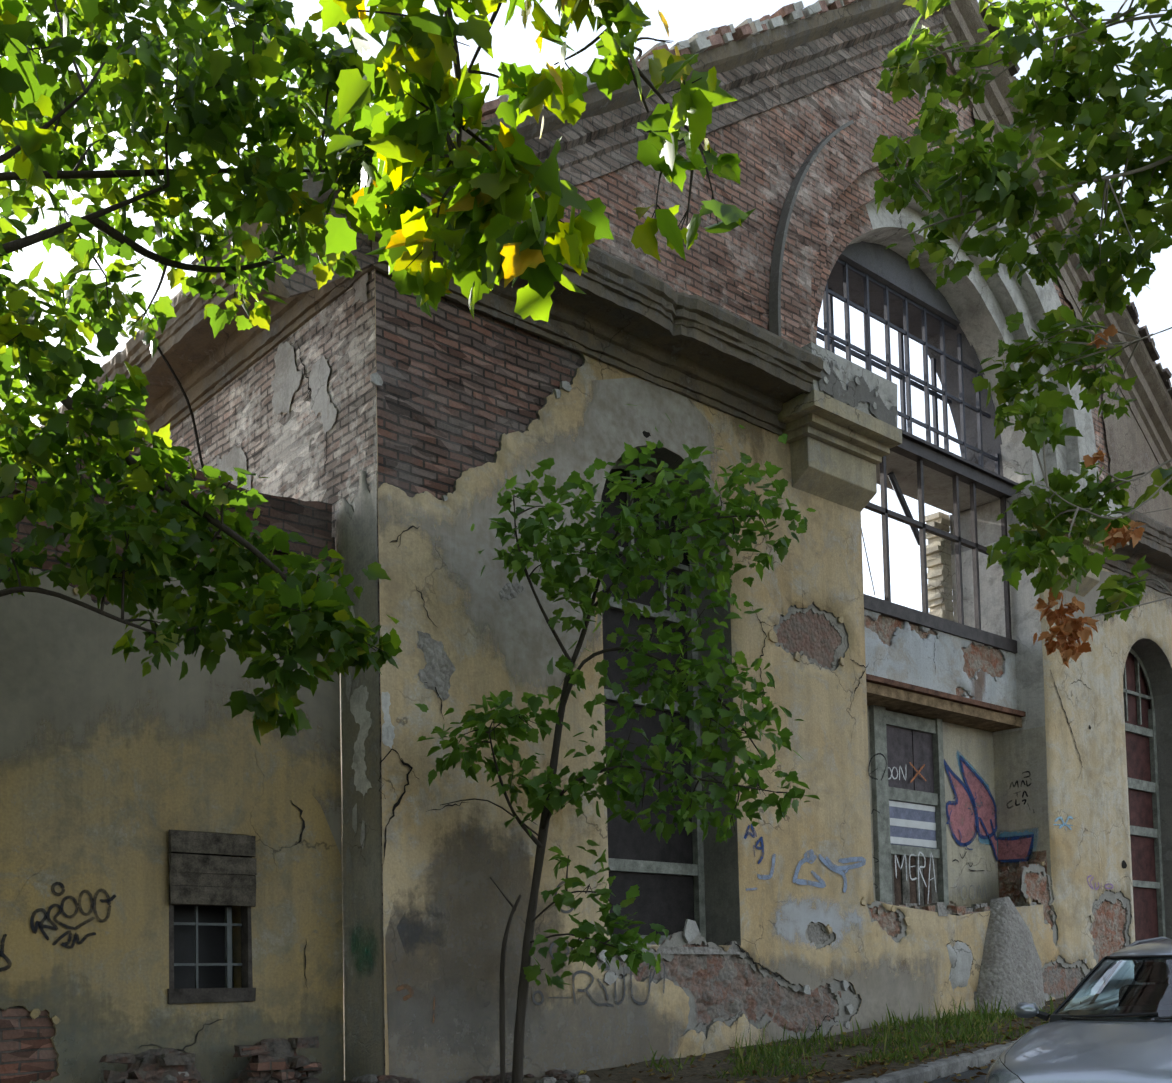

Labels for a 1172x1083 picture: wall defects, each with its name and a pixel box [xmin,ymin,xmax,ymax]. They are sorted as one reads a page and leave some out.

flaking render [370,269,725,692]
flaking render [768,604,848,671]
flaking render [864,615,940,646]
flaking render [956,643,1004,699]
crack [291,801,305,846]
flaking render [345,666,395,875]
crack [378,749,419,864]
spalling [597,919,860,1040]
flaking render [1019,861,1131,1001]
flaking render [0,1006,61,1083]